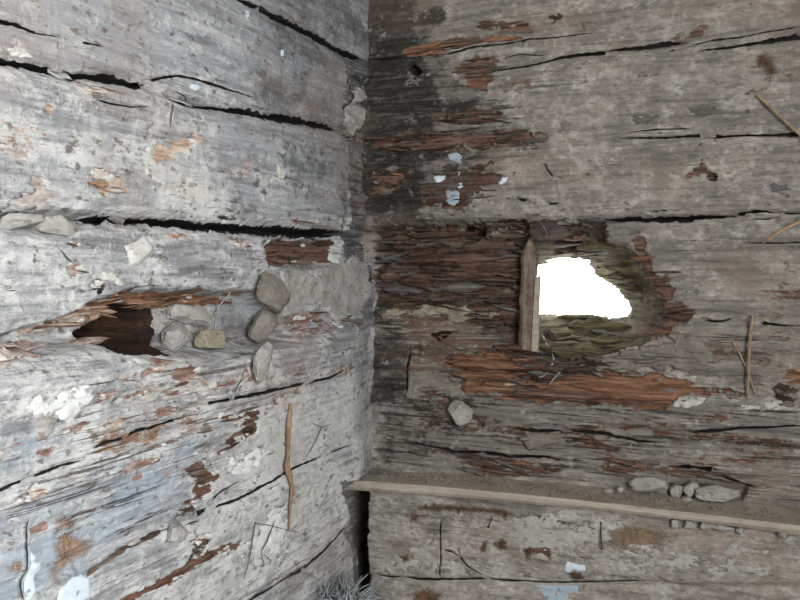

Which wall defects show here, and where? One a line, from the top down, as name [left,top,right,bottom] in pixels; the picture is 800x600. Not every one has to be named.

crack [0,0,405,144]
spalling [451,56,509,91]
crack [431,23,800,75]
peeling [419,153,515,216]
spalling [264,237,334,269]
spalling [535,237,668,365]
spalling [16,272,257,435]
crack [0,364,349,497]
spalling [179,410,270,512]
crack [190,440,355,521]
crack [399,420,763,492]
crack [244,520,343,600]